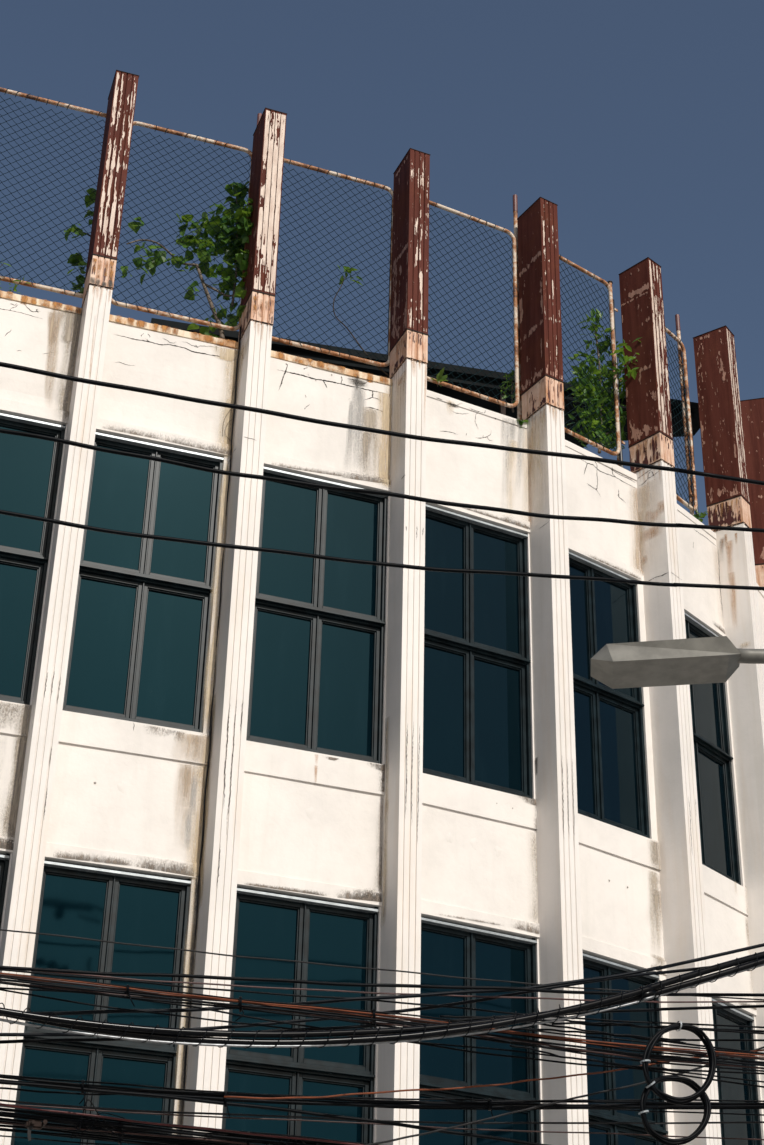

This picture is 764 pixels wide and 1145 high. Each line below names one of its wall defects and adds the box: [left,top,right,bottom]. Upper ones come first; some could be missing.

rust [0,291,81,314]
leakage [48,309,82,416]
rust [116,315,178,335]
crack [119,333,234,366]
rust [194,332,236,349]
crack [278,364,383,412]
leakage [280,375,393,484]
leakage [57,348,242,1028]
leakage [0,704,32,850]
leakage [178,1045,186,1135]